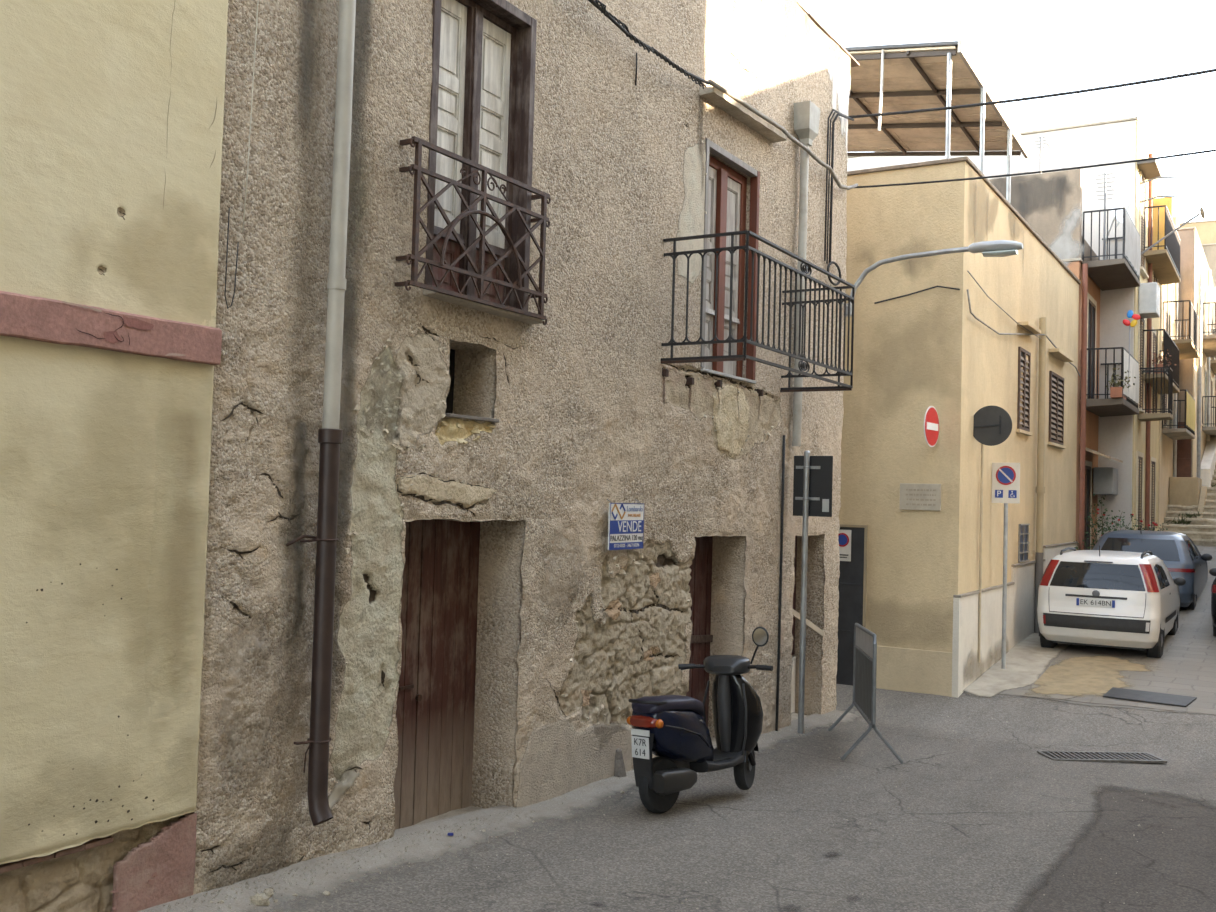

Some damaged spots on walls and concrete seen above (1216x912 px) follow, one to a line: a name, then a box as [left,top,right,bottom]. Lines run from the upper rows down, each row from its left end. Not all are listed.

spalling [665,364,781,460]
peeling [329,329,498,782]
spalling [558,540,693,746]
spalling [0,774,249,912]